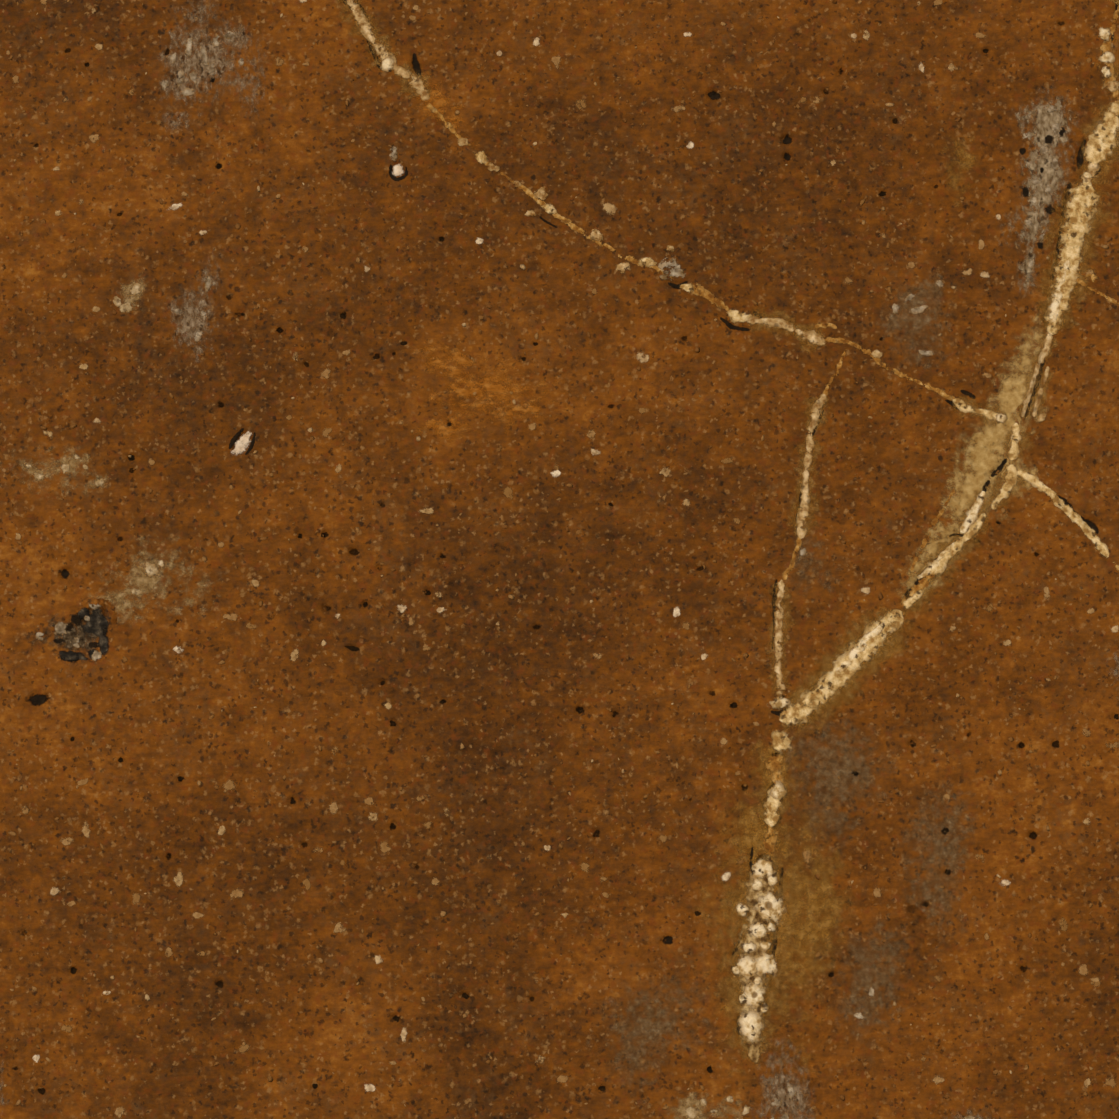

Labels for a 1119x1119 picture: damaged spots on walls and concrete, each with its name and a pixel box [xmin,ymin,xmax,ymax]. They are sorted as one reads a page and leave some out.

crack [338,0,1119,1063]
water stain [792,316,1045,716]
water stain [723,729,870,1015]